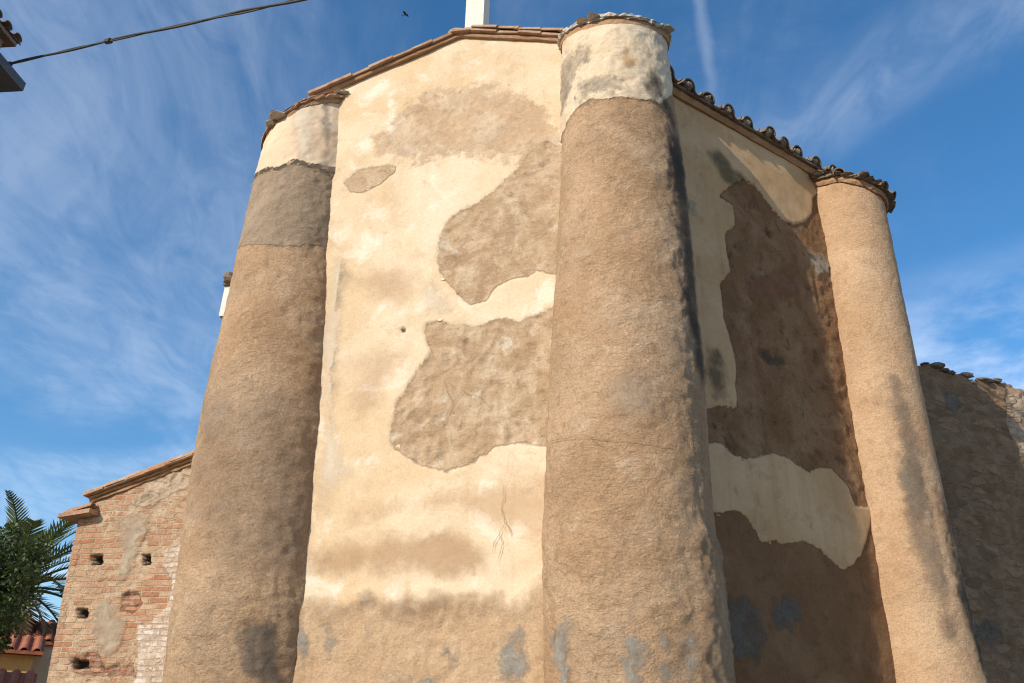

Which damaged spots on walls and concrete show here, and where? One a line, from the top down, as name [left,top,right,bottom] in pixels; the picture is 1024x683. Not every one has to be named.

flaking render [324,260,343,369]
flaking render [238,23,673,304]
flaking render [390,308,553,472]
leakage [664,100,724,389]
flaking render [707,179,868,507]
flaking render [70,540,181,683]
leakage [320,534,479,573]
flaking render [714,510,897,683]